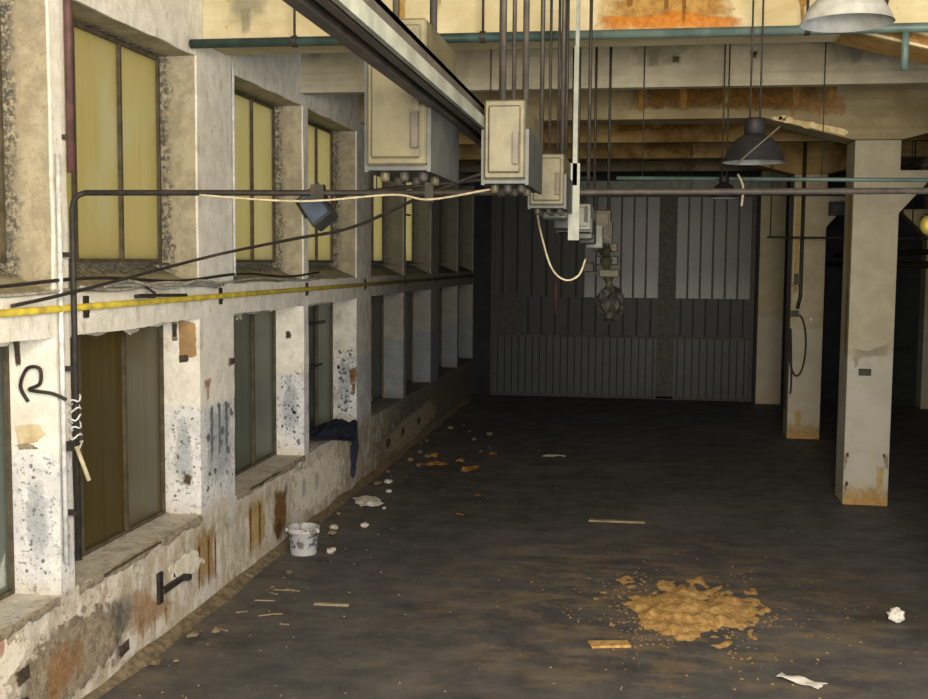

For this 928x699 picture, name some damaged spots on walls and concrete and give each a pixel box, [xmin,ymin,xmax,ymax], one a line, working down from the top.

corrosion [843,490,888,506]
peeling [168,549,205,581]
flaking render [0,602,130,699]